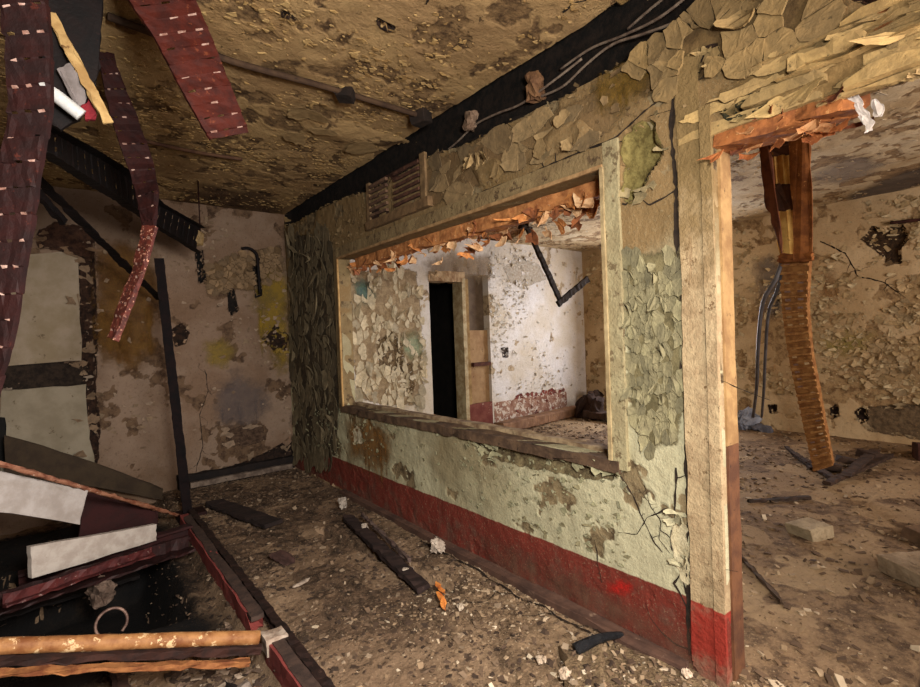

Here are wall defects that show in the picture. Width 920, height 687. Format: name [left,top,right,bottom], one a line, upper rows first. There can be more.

rust [347,192,600,276]
peeling [195,0,920,474]
crack [482,97,680,273]
crack [618,422,692,657]